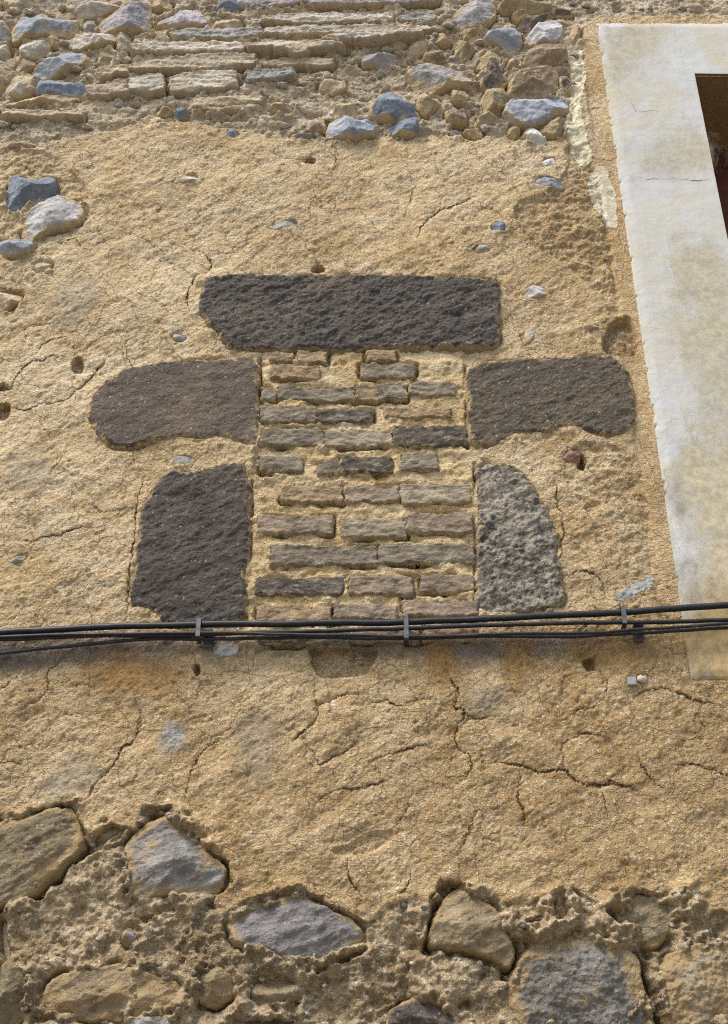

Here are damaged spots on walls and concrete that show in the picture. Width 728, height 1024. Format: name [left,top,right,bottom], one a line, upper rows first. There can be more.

crack [12,323,133,411]
crack [18,481,144,619]
crack [1,657,88,787]
crack [80,714,141,802]
crack [183,719,220,802]
crack [295,670,727,854]
spalling [0,797,728,1024]